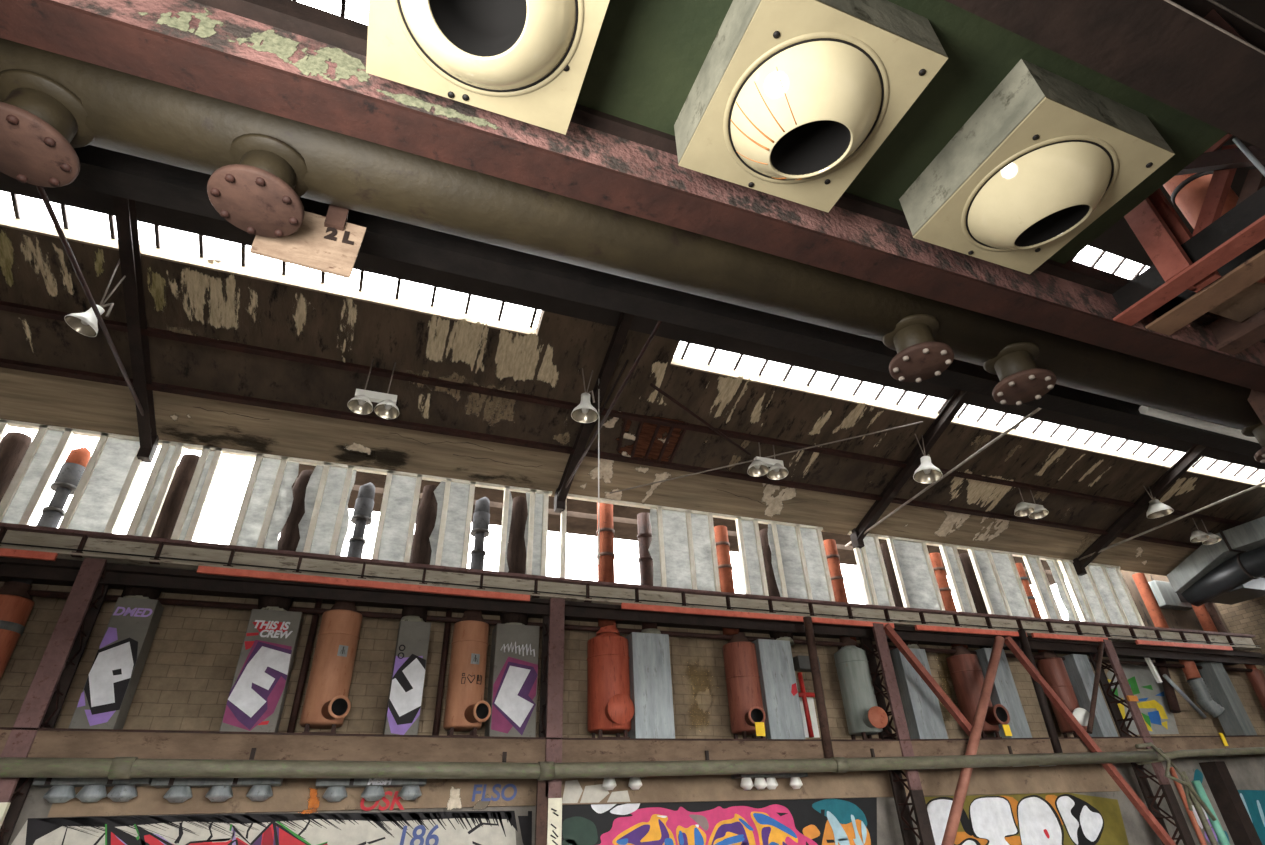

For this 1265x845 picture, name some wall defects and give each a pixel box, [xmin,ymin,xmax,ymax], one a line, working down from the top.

peeling [0,230,74,297]
peeling [147,255,258,340]
peeling [293,294,310,336]
water stain [163,426,273,453]
water stain [334,443,408,470]
peeling [407,314,559,426]
spalling [580,361,689,504]
peeling [706,376,750,423]
spalling [762,483,796,517]
peeling [789,403,886,475]
peeling [935,445,1022,541]
peeling [1035,448,1109,487]